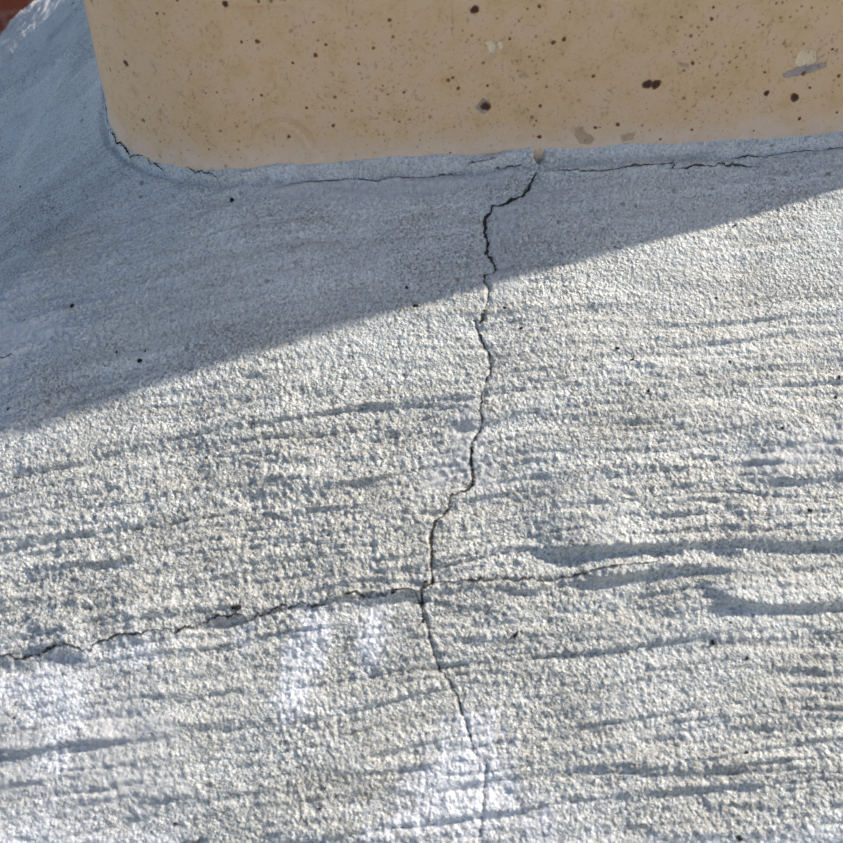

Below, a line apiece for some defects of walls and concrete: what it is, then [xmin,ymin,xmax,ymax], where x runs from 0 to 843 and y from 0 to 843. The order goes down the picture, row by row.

crack [105,102,168,176]
crack [557,147,842,172]
crack [0,157,662,841]